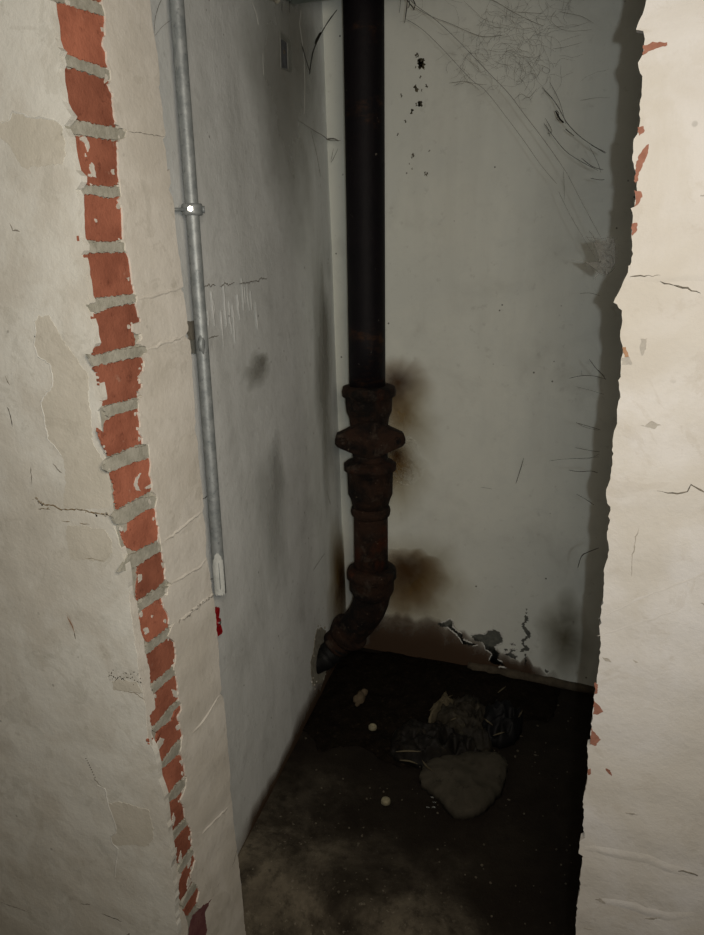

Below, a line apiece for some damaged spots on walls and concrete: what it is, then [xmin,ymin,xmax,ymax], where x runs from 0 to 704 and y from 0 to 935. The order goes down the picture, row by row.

rust [385,370,414,430]
crack [33,497,109,525]
flaking render [0,0,202,935]
crack [661,484,704,494]
rust [334,553,346,606]
leakage [363,616,543,676]
peeling [438,609,531,668]